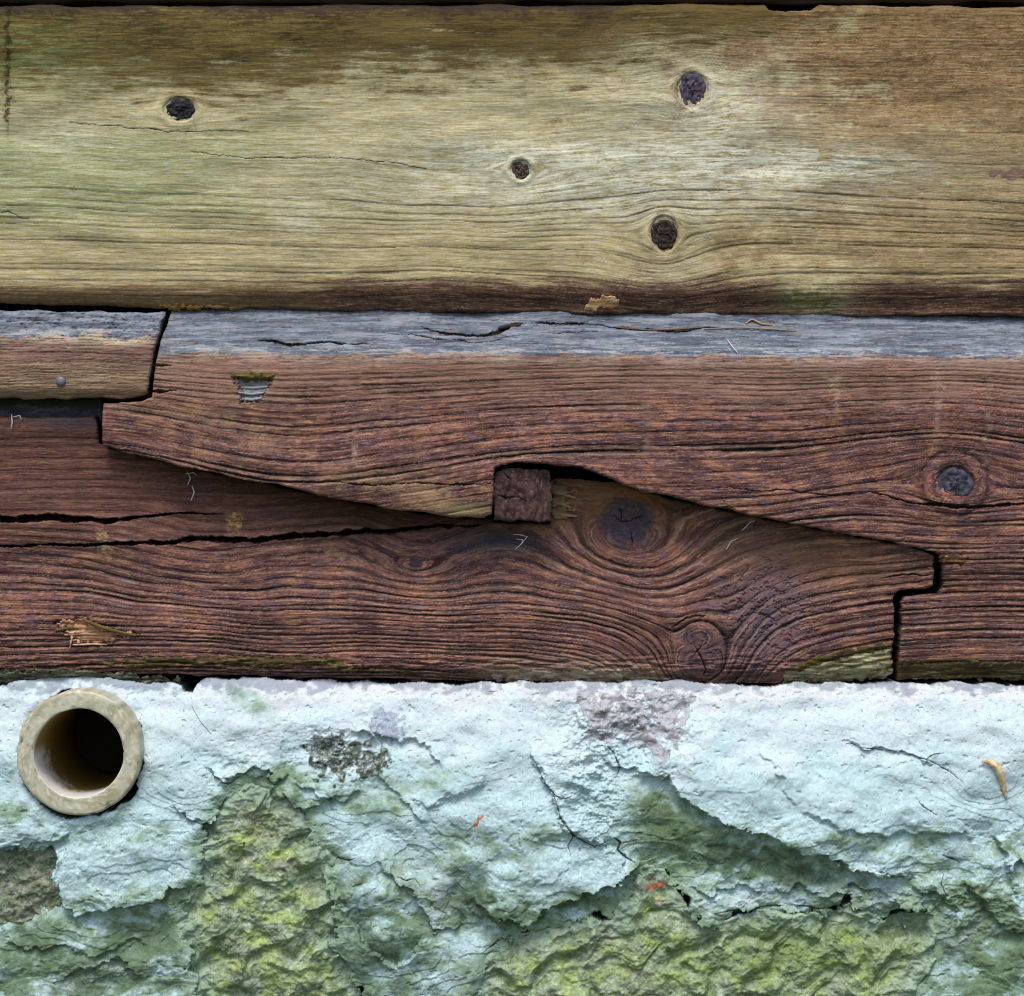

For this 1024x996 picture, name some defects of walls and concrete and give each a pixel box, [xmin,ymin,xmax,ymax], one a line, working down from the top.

crack [258,322,733,347]
crack [0,512,474,548]
crack [535,762,642,863]
crack [846,743,964,783]
peeling [982,760,1007,798]
spalling [0,841,62,924]
spalling [173,779,363,996]
spalling [473,864,937,996]